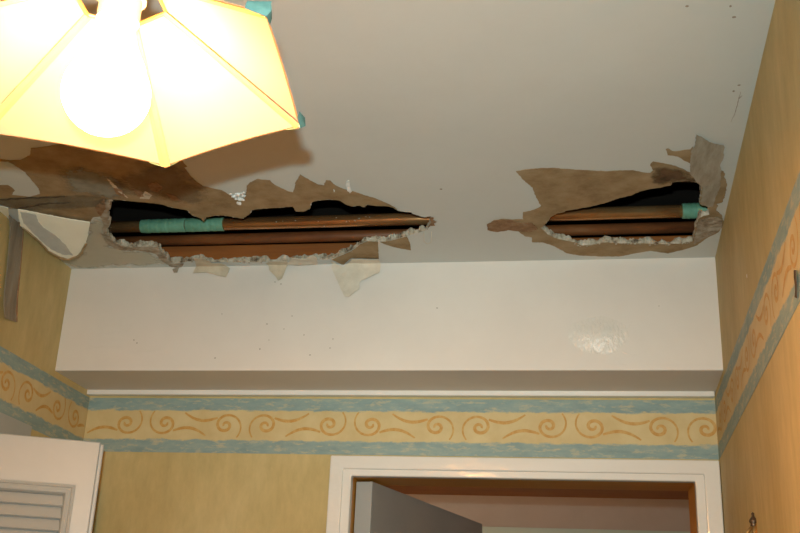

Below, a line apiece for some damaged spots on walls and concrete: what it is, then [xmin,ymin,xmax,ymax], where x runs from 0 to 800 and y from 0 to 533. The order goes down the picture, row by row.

peeling [0,206,90,322]
spalling [100,199,431,297]
spalling [541,185,722,245]